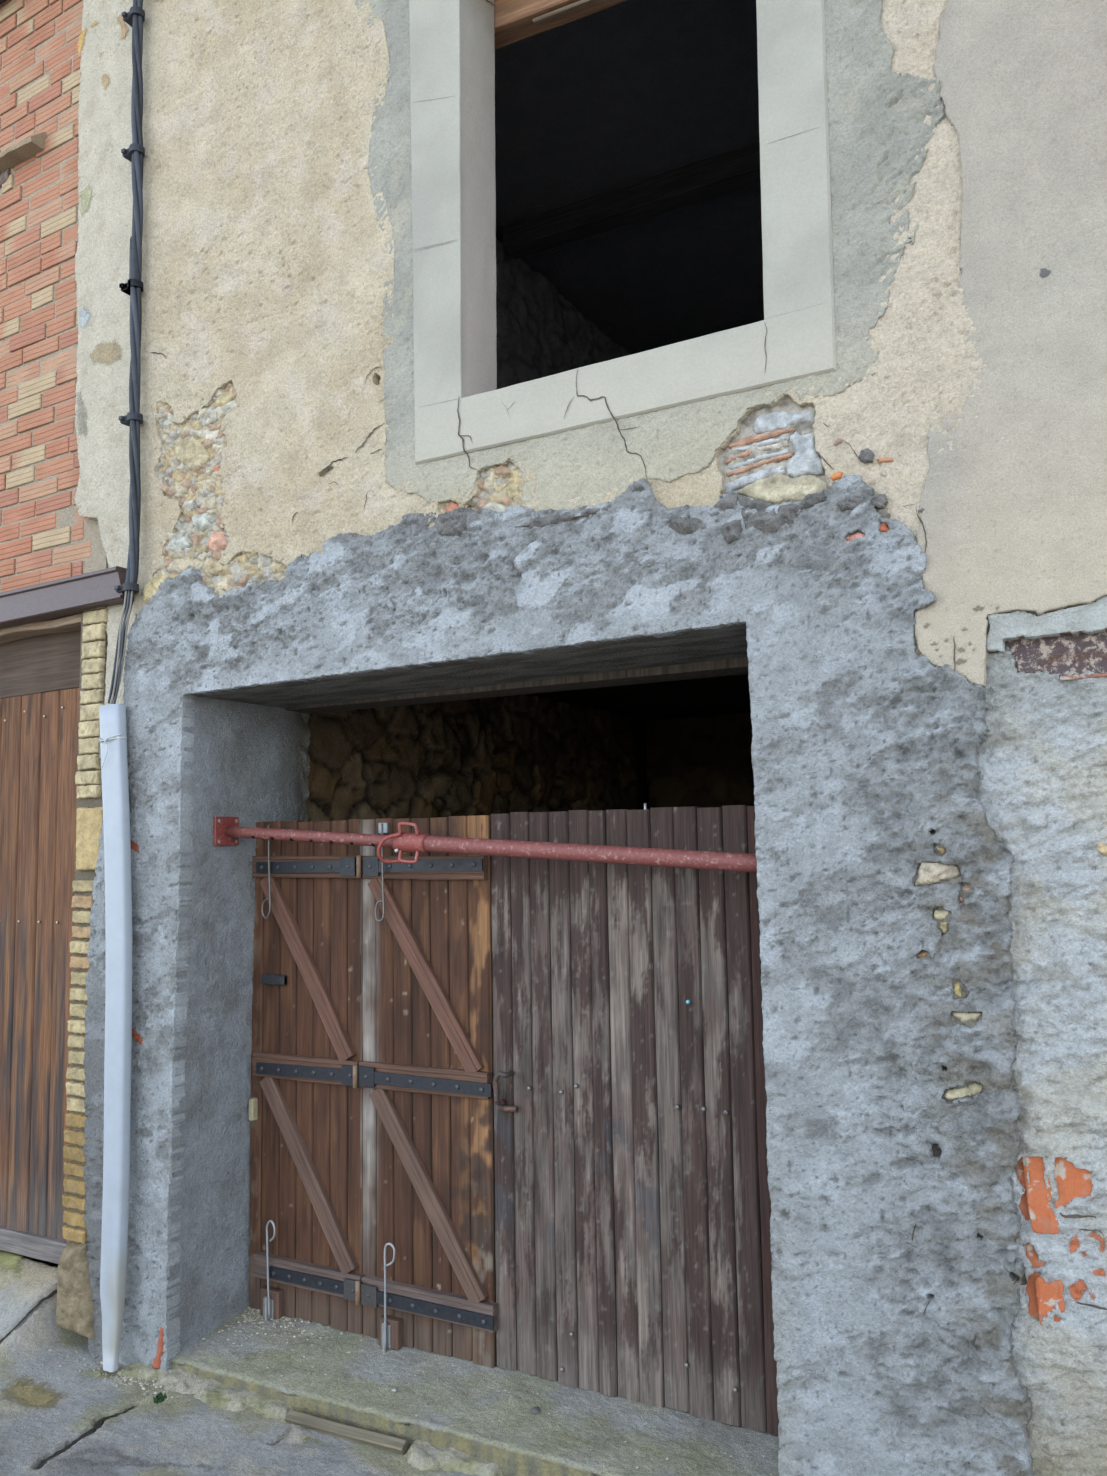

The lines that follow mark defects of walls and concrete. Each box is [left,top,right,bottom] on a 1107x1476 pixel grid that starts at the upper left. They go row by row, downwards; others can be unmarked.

flaking render [141,383,287,604]
crack [457,399,477,470]
crack [564,370,648,481]
flaking render [718,397,843,505]
flaking render [1011,1155,1106,1326]